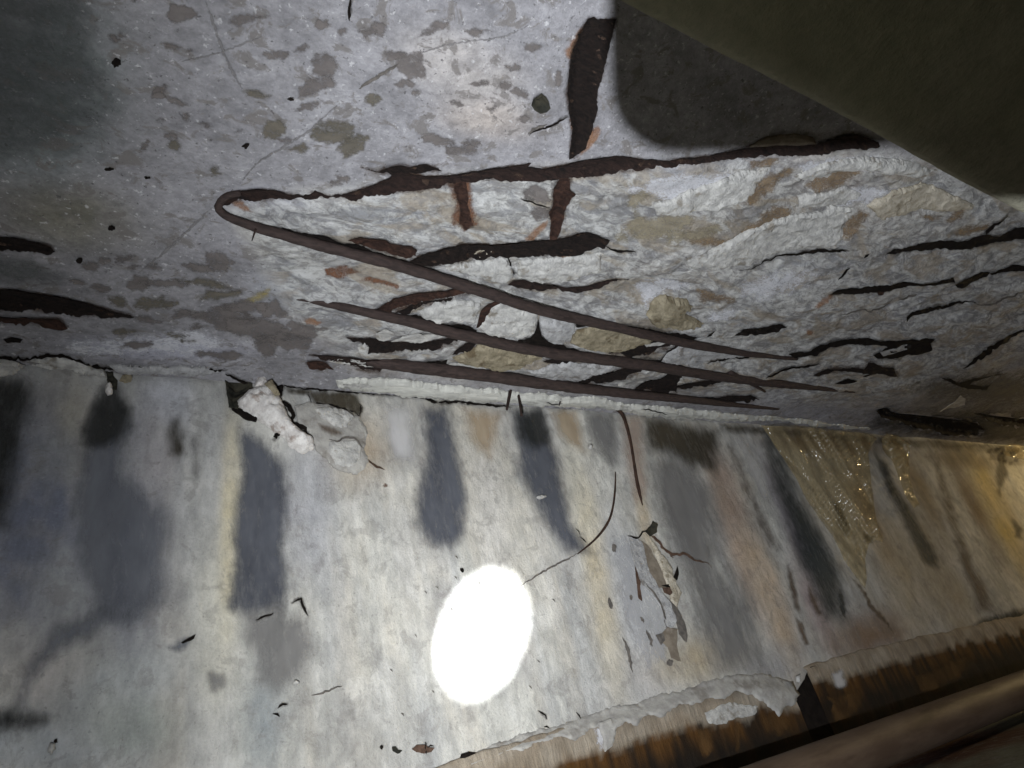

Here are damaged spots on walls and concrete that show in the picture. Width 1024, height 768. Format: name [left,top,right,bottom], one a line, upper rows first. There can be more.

corrosion [325,265,467,311]
corrosion [353,165,523,229]
corrosion [363,223,606,267]
spalling [214,190,855,410]
peeling [687,155,975,271]
water stain [237,376,314,454]
flaking render [289,389,384,475]
water stain [419,409,464,544]
water stain [517,412,584,550]
water stain [230,434,307,685]
crack [521,528,586,586]
crack [651,536,712,568]